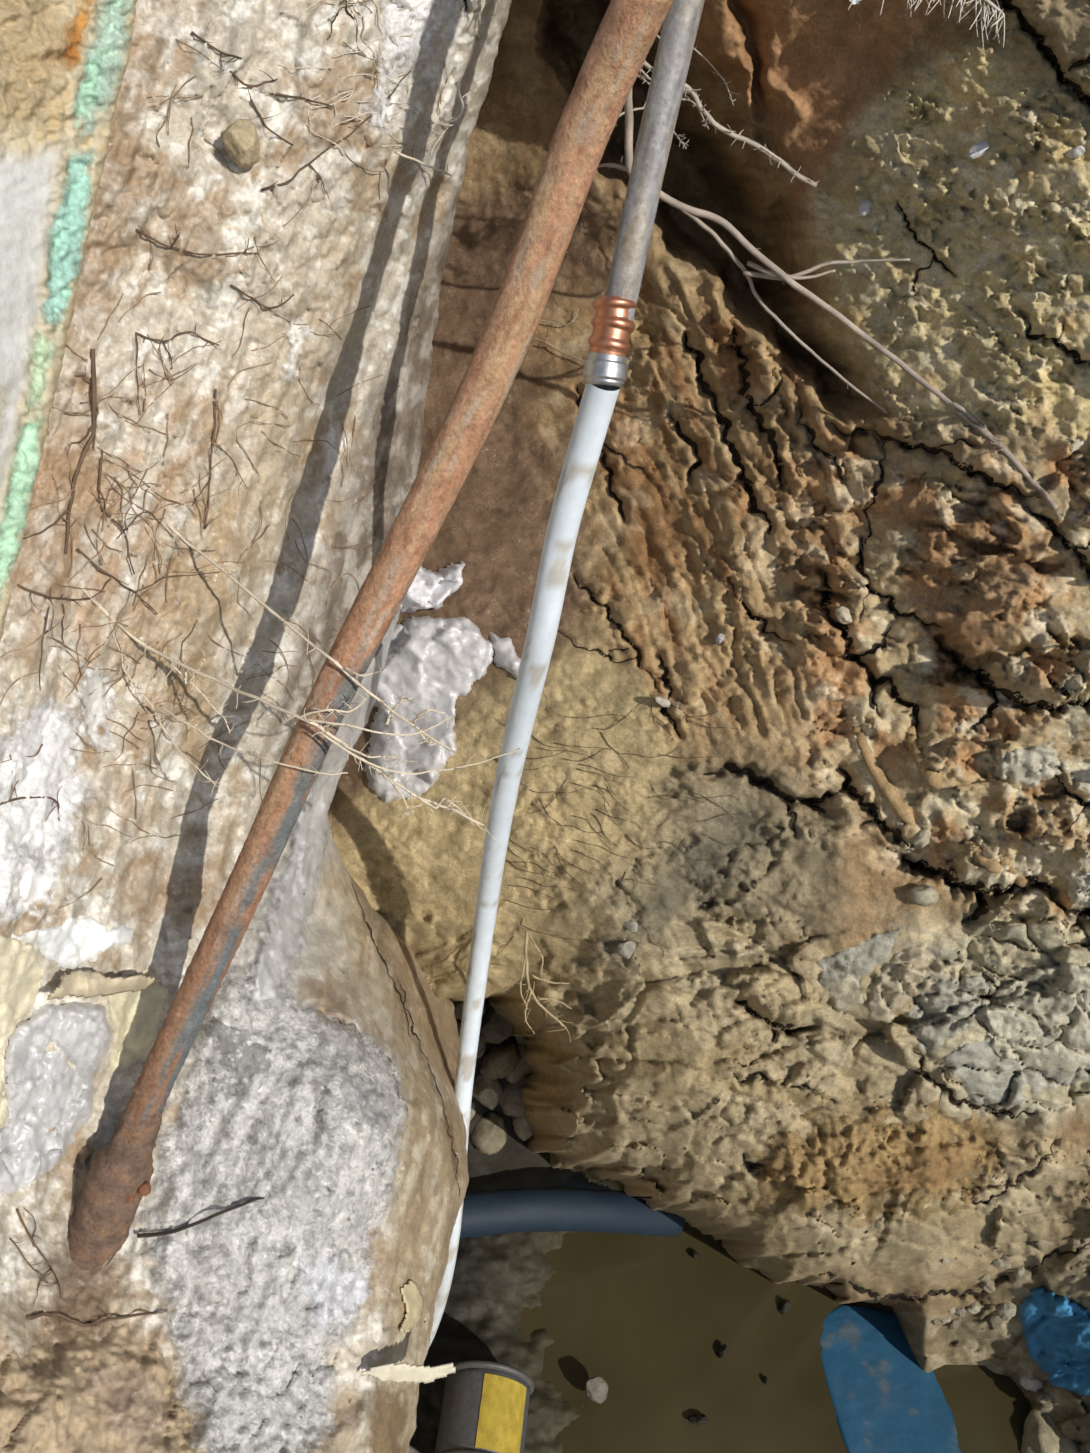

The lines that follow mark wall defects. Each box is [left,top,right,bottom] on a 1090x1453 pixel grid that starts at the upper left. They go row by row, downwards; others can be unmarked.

efflorescence [0,663,118,921]
crack [319,885,460,1197]
spalling [139,968,406,1453]
peeling [361,1362,456,1384]
peeling [399,1280,423,1334]